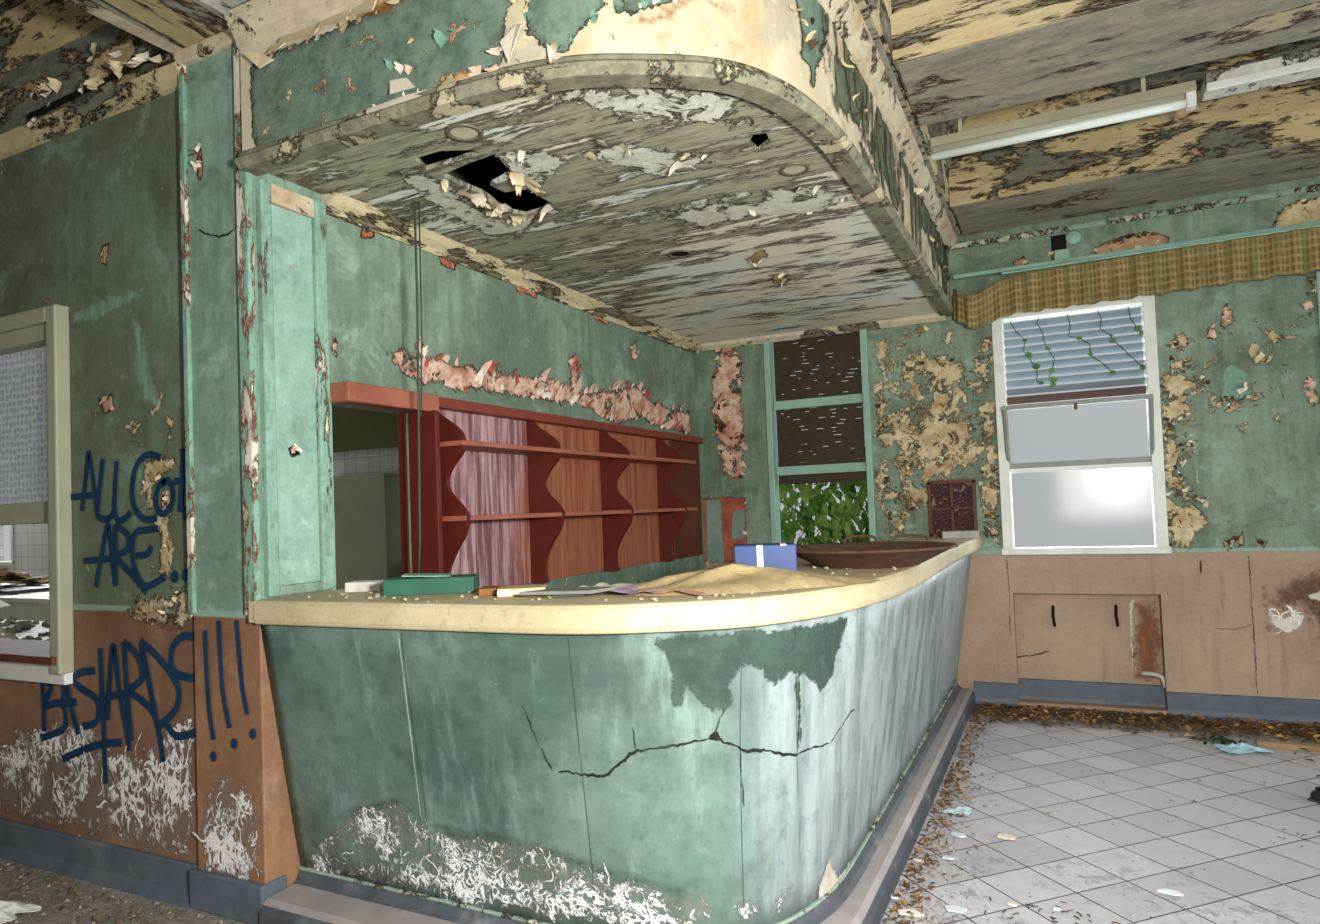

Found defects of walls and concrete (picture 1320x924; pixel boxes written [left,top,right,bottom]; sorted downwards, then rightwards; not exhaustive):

peeling [22,39,164,128]
peeling [243,0,677,147]
peeling [549,87,780,131]
flaking render [396,148,569,236]
peeling [659,185,856,230]
peeling [386,336,692,436]
peeling [872,324,1002,545]
peeling [1159,277,1320,552]
water stain [1267,574,1320,634]
water stain [0,718,262,880]
crack [524,675,853,805]
water stain [309,803,712,924]